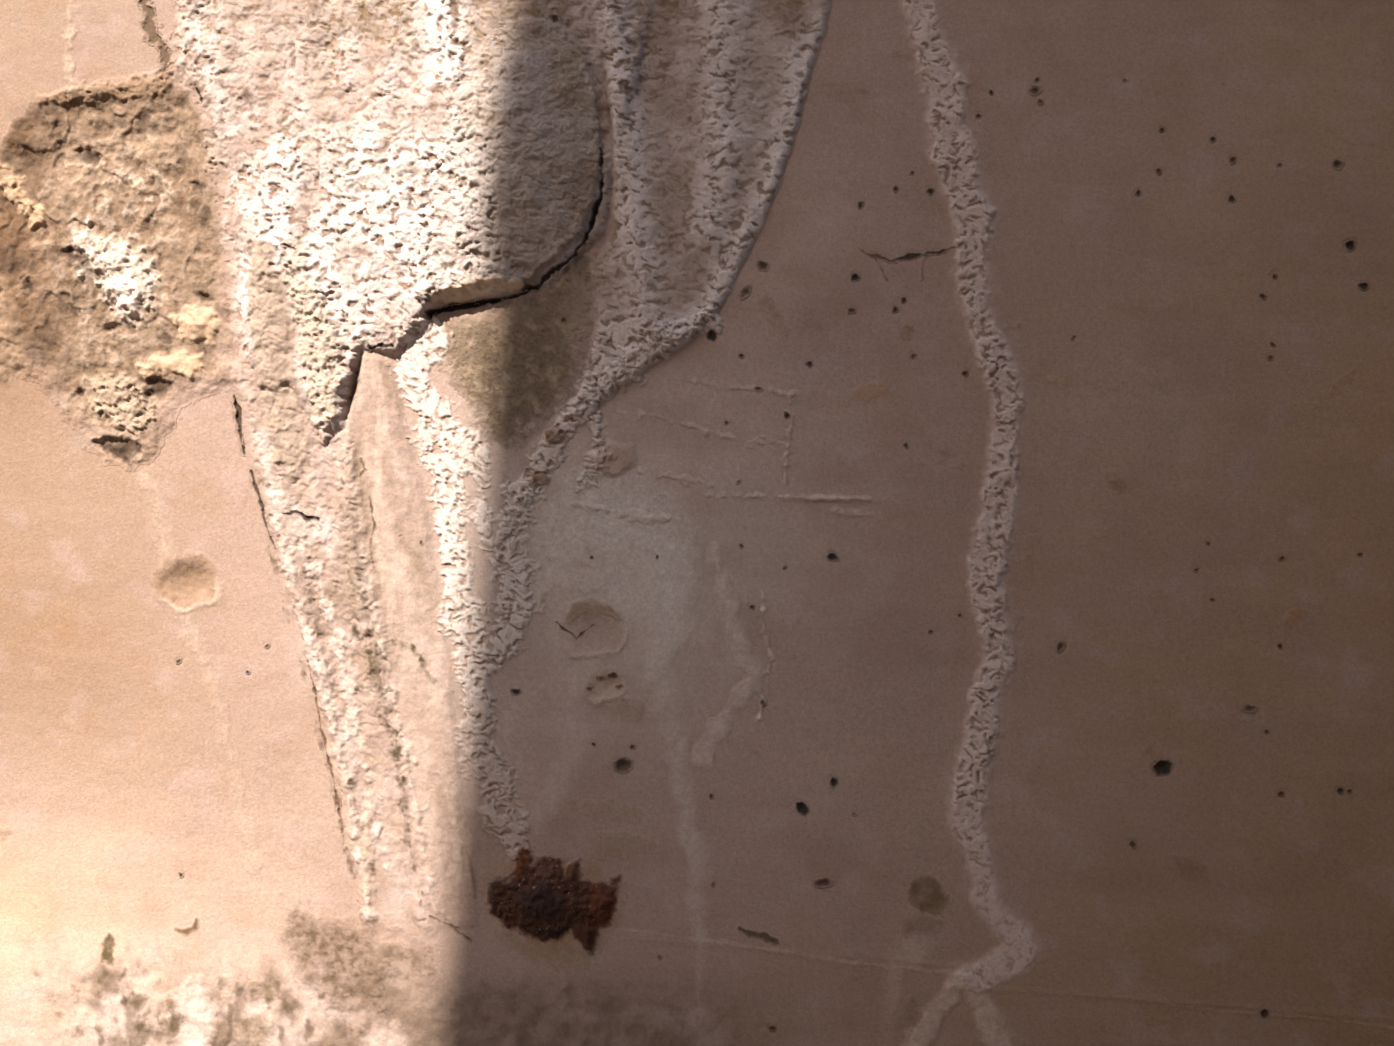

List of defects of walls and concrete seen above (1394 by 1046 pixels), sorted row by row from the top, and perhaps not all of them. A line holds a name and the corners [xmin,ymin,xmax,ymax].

crack [858,246,957,286]
spalling [0,83,479,941]
crack [232,394,321,550]
crack [358,456,378,568]
water stain [29,0,891,1046]
water stain [873,0,1048,1046]
crack [307,659,347,855]
corrosion [474,842,635,978]